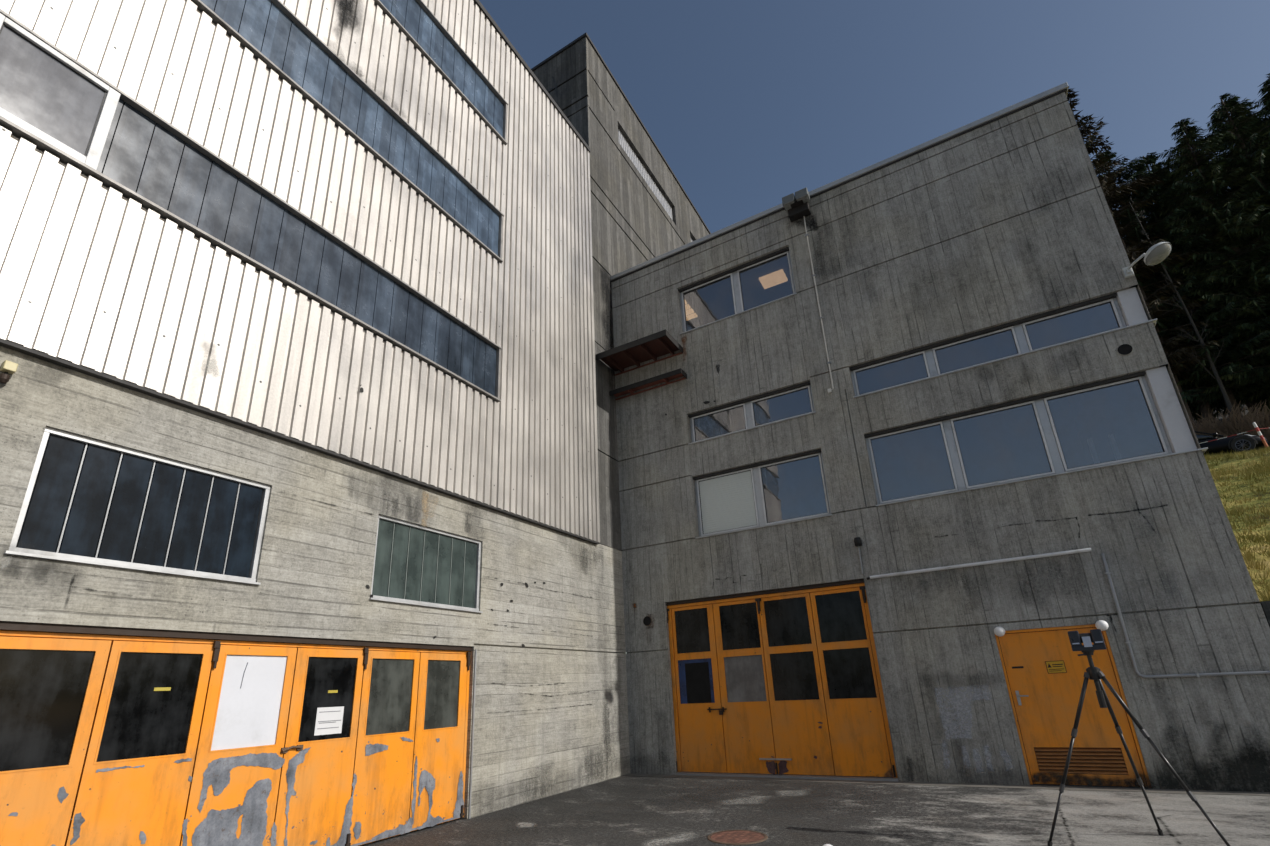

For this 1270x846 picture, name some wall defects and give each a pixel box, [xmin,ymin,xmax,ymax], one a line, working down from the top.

peeling [96,765,145,773]
peeling [57,786,69,803]
peeling [174,747,311,846]
peeling [310,737,464,846]
peeling [51,812,85,846]